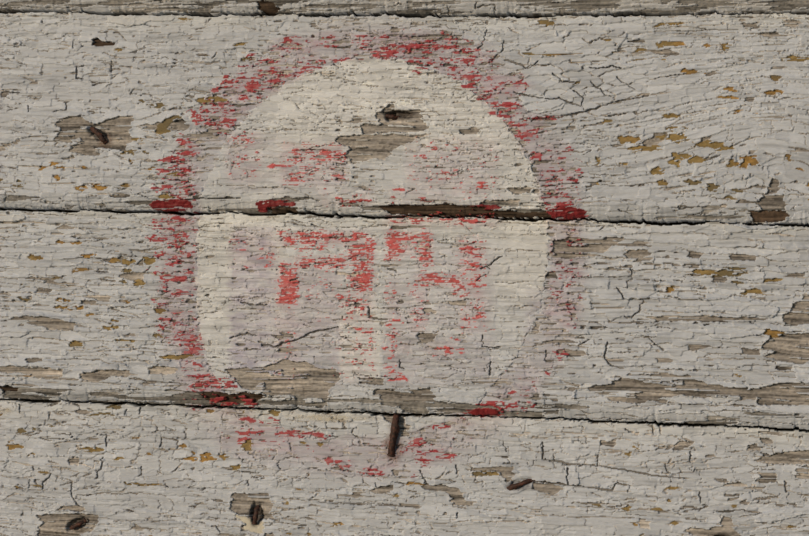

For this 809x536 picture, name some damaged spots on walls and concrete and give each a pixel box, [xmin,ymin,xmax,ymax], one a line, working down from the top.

crack [433,5,452,42]
crack [474,2,650,122]
peeling [53,115,139,164]
peeling [336,104,429,164]
peeling [618,114,734,167]
peeling [381,186,553,220]
peeling [725,179,809,230]
peeling [589,268,809,414]
peeling [200,360,340,416]
peeling [359,378,486,436]
crack [95,434,107,479]
crack [534,441,692,492]